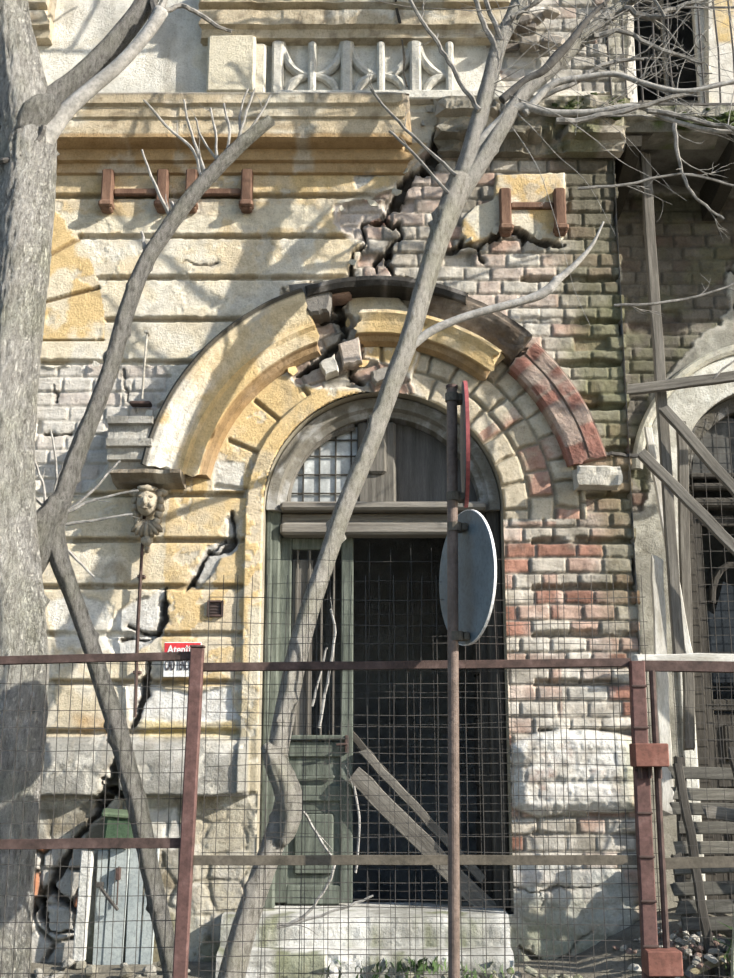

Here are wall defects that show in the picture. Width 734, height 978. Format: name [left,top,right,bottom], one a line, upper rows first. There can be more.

flaking render [177,146,458,279]
flaking render [287,302,389,392]
crack [445,226,567,264]
flaking render [436,158,625,386]
flaking render [707,279,732,330]
flaking render [35,361,103,495]
flaking render [74,364,172,493]
peeling [47,595,81,649]
flaking render [82,585,169,653]
crack [121,510,239,728]
flaking render [399,352,651,963]
crack [33,758,124,933]